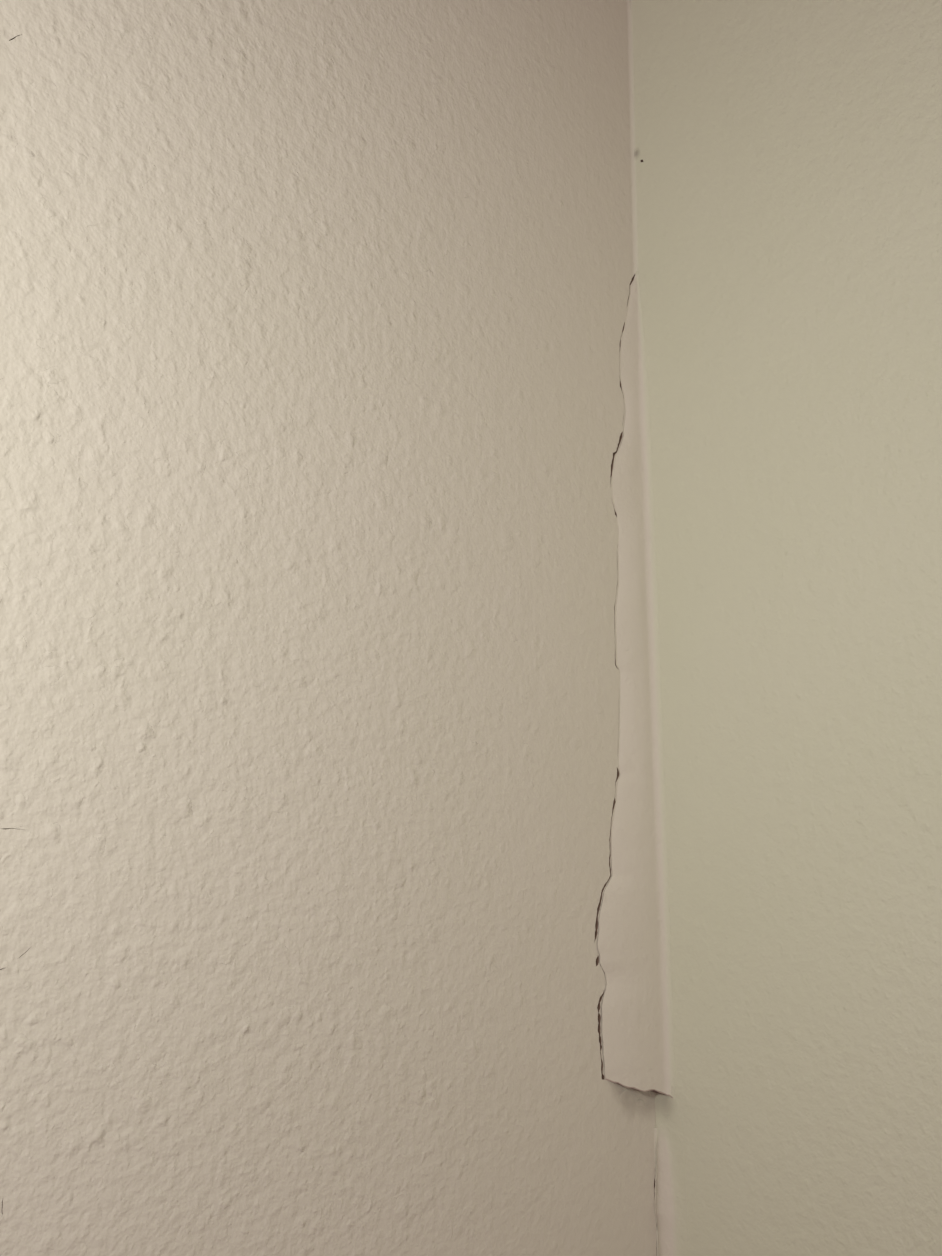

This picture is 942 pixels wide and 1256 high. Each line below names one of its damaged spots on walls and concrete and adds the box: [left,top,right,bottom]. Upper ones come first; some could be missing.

crack [610,275,635,517]
crack [594,768,619,1080]